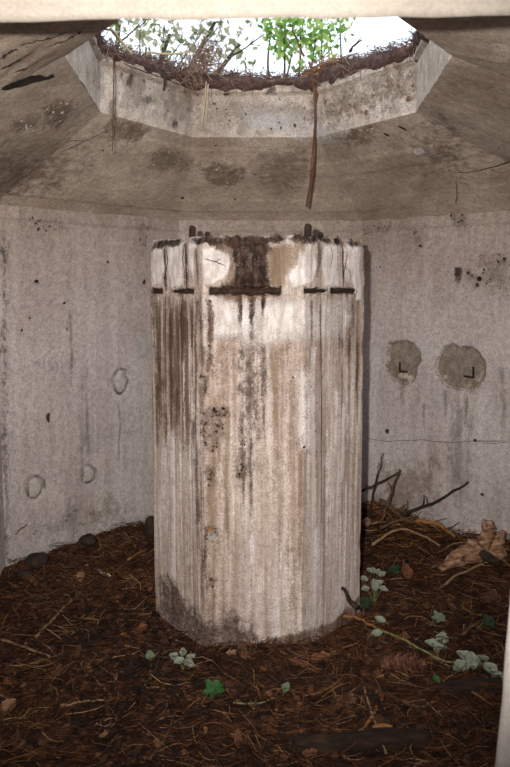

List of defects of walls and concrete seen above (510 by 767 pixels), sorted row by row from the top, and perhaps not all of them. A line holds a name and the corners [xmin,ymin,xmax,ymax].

crack [454,160,509,222]
corrosion [209,241,304,296]
water stain [152,237,362,648]